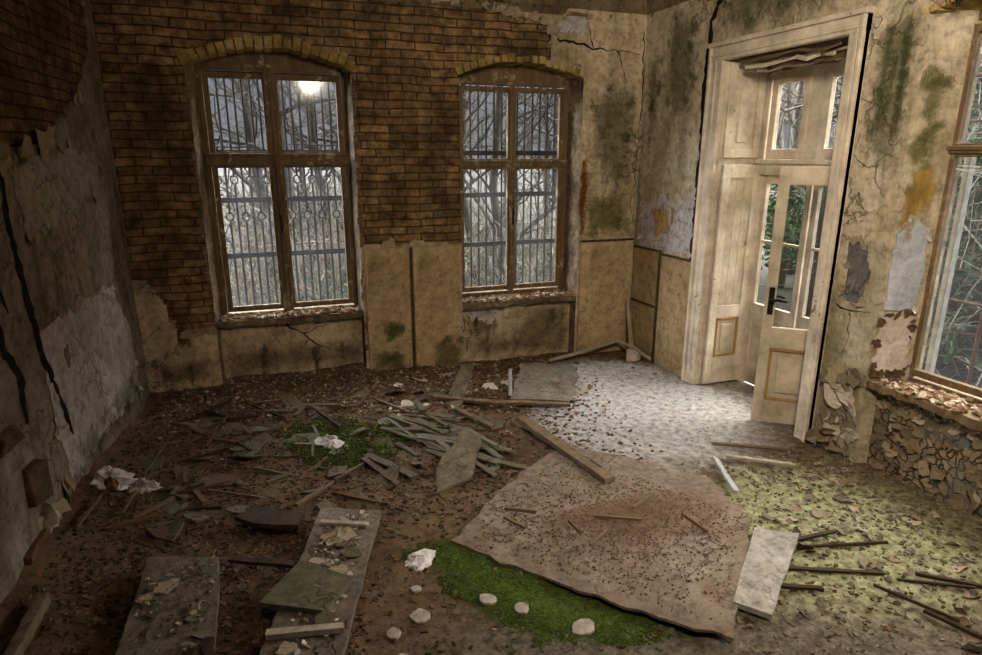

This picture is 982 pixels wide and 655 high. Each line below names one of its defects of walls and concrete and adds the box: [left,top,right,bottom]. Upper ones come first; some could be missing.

peeling [38,283,144,533]
flaking render [0,0,594,353]
leakage [589,197,628,238]
peeling [805,214,982,520]